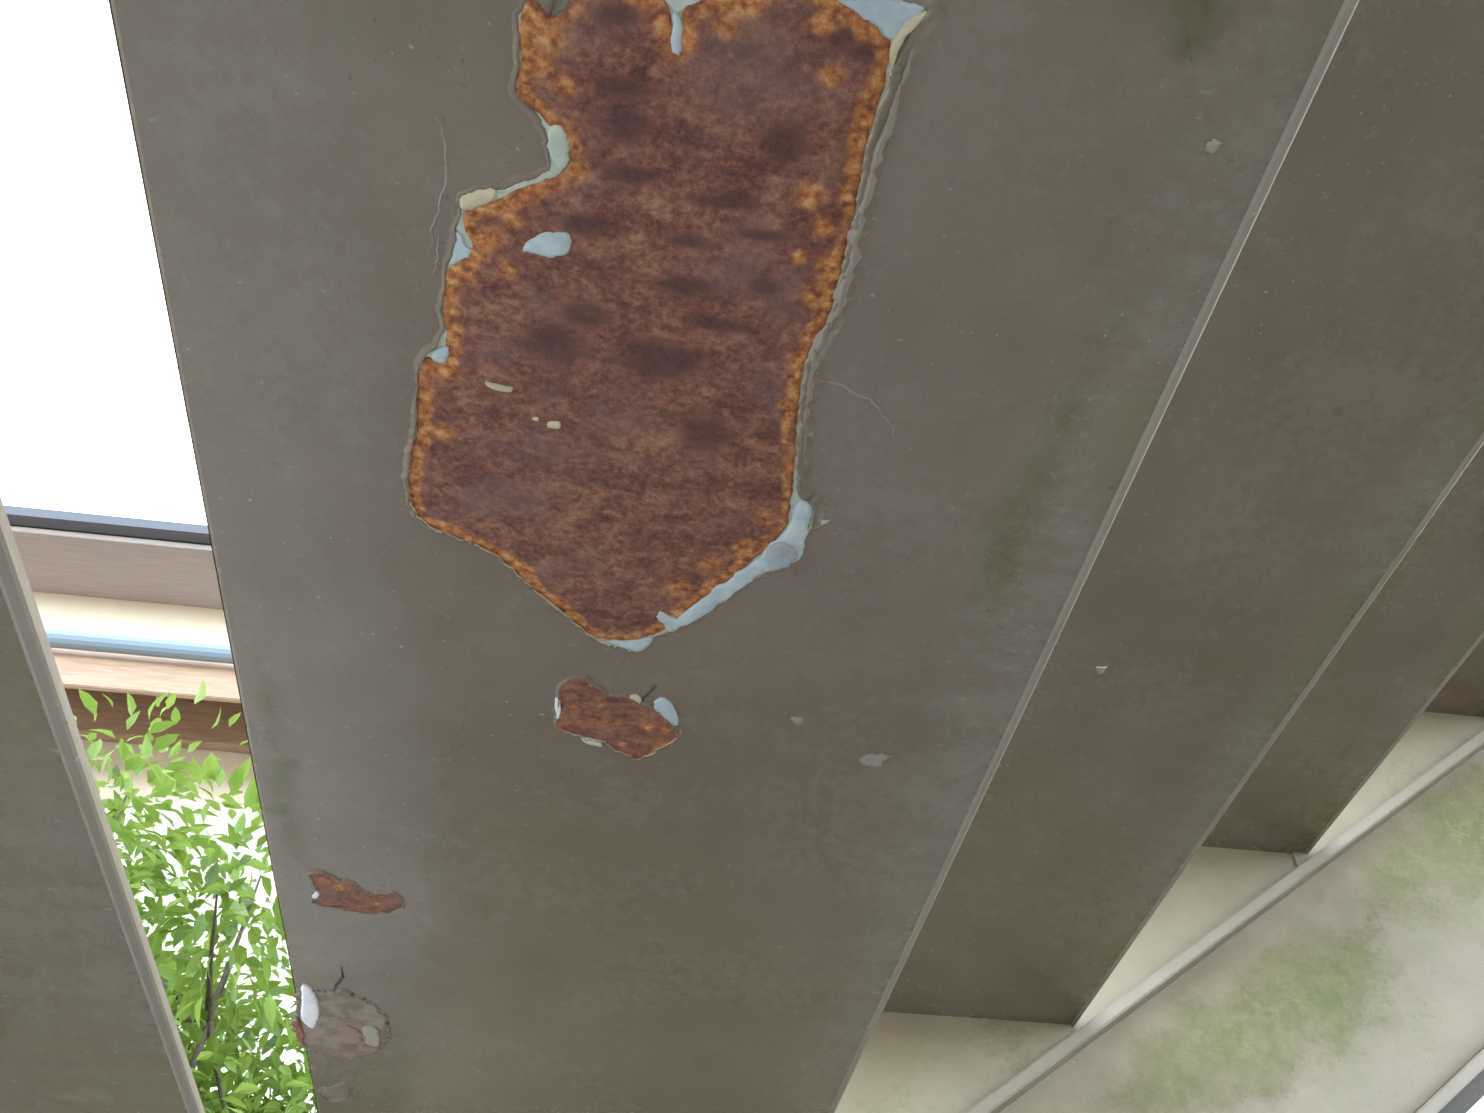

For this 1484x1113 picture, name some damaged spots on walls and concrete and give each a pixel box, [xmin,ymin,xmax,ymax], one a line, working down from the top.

rust [401,0,947,653]
rust [551,674,682,761]
rust [306,869,406,915]
peeling [289,967,391,1061]